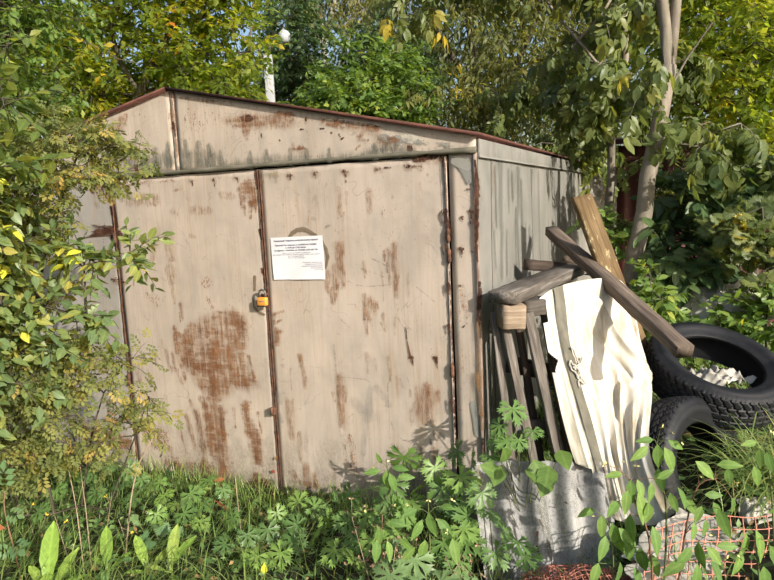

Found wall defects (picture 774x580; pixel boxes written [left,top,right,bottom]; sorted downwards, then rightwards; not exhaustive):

corrosion [229,111,291,132]
corrosion [234,169,268,297]
corrosion [404,145,452,251]
corrosion [168,298,256,476]
corrosion [235,405,262,463]
corrosion [248,415,281,500]
corrosion [268,309,284,405]
corrosion [446,265,468,364]